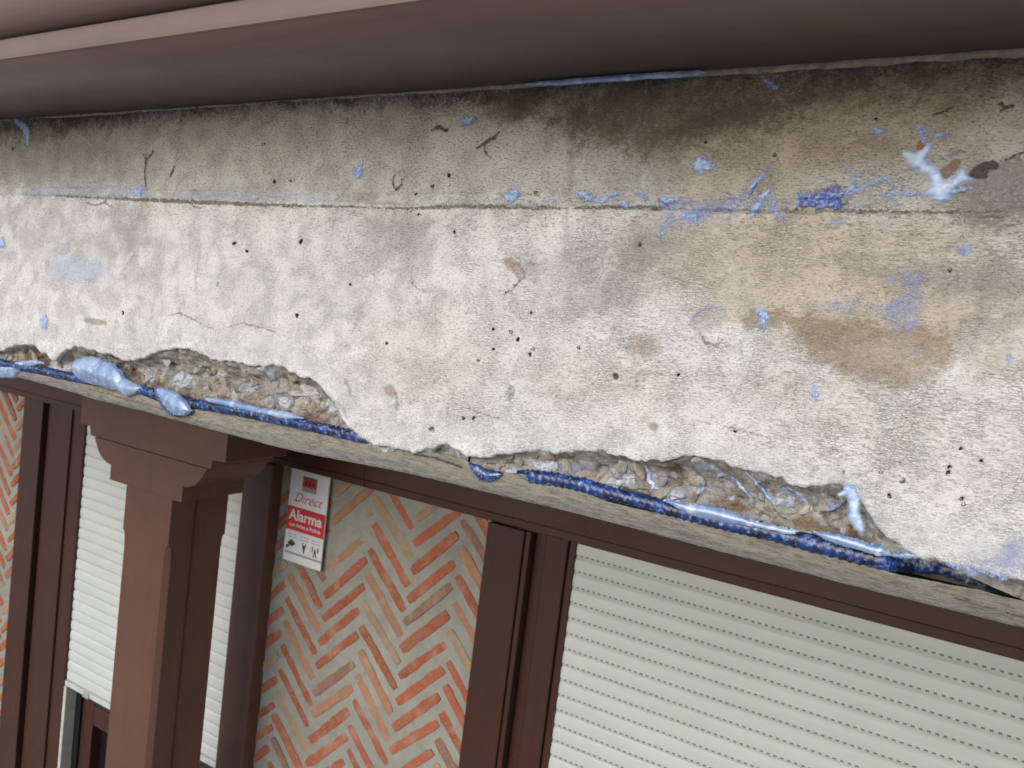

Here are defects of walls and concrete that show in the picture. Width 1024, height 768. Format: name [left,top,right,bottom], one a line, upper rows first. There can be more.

water stain [414,58,1024,156]
spalling [0,345,351,429]
spalling [433,444,909,553]
spalling [928,557,1024,600]